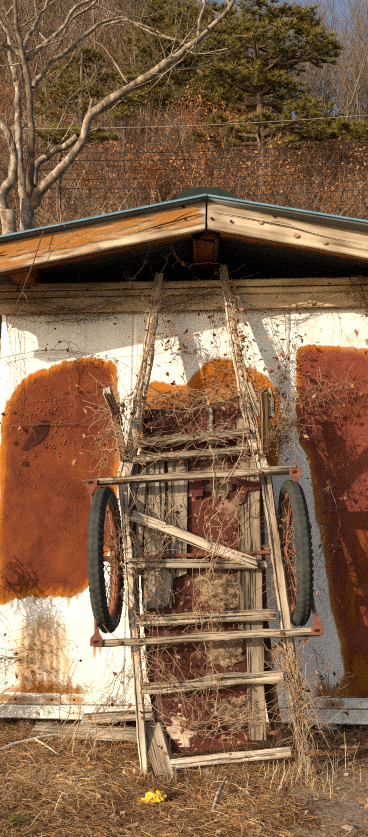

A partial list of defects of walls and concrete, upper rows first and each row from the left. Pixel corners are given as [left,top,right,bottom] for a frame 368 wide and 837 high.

rust [144,358,238,415]
rust [247,367,280,467]
rust [0,357,120,605]
rust [296,344,368,709]
rust [0,620,83,704]